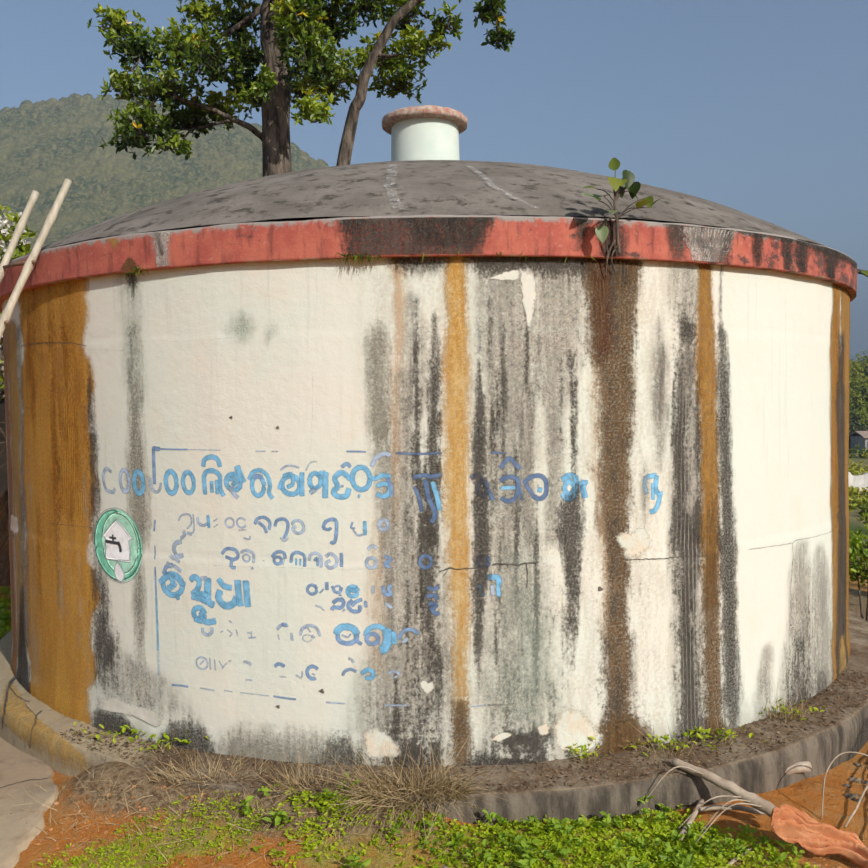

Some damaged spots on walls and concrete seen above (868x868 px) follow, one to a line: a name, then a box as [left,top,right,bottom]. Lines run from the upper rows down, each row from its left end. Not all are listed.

rust [1,279,100,767]
water stain [88,377,100,544]
water stain [92,709,136,737]
water stain [91,559,161,706]
water stain [127,367,149,544]
rust [442,257,472,766]
water stain [338,217,654,767]
peeling [487,269,536,330]
rust [696,264,725,735]
water stain [656,224,857,741]
rust [829,283,850,681]